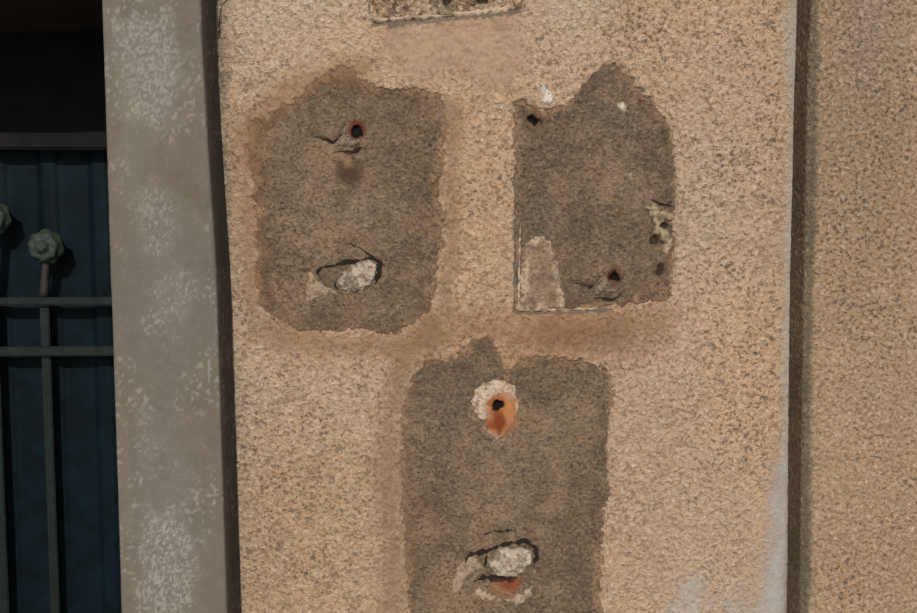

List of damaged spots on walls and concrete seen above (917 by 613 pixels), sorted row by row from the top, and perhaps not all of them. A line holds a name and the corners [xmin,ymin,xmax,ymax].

spalling [371,0,523,24]
peeling [245,66,447,335]
peeling [512,64,676,314]
corrosion [489,396,515,434]
peeling [399,338,615,613]